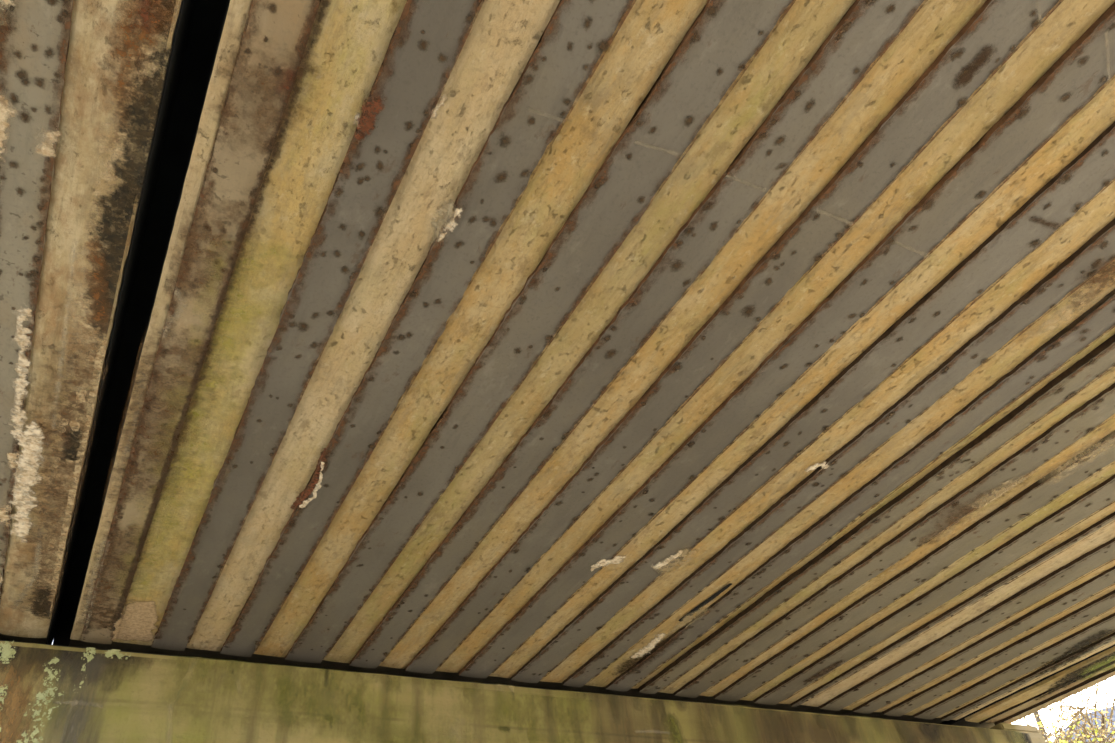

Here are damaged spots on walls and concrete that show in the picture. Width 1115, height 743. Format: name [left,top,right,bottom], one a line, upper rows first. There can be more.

corrosion [0,0,108,619]
corrosion [154,0,570,651]
corrosion [290,0,1115,717]
damp [0,645,142,743]